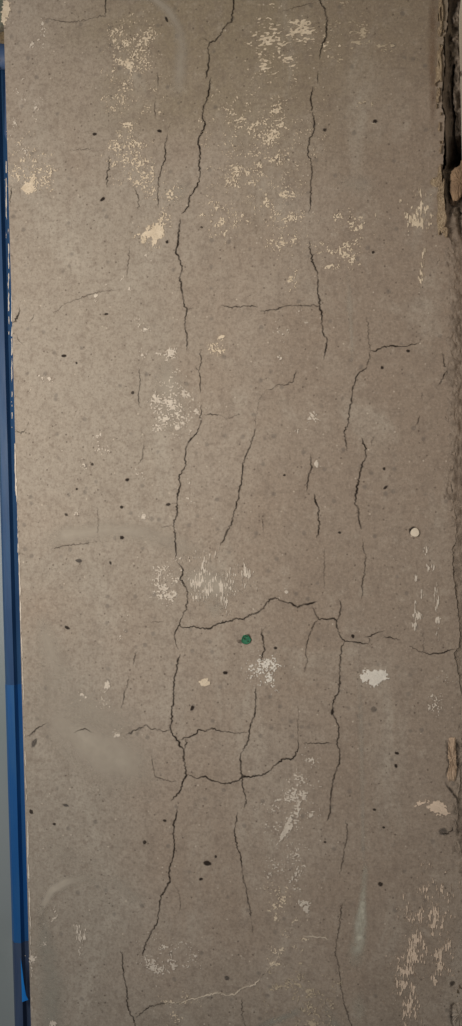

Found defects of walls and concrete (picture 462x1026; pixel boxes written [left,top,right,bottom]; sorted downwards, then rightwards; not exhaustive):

crack [122,0,415,1021]
spalling [400,0,456,238]